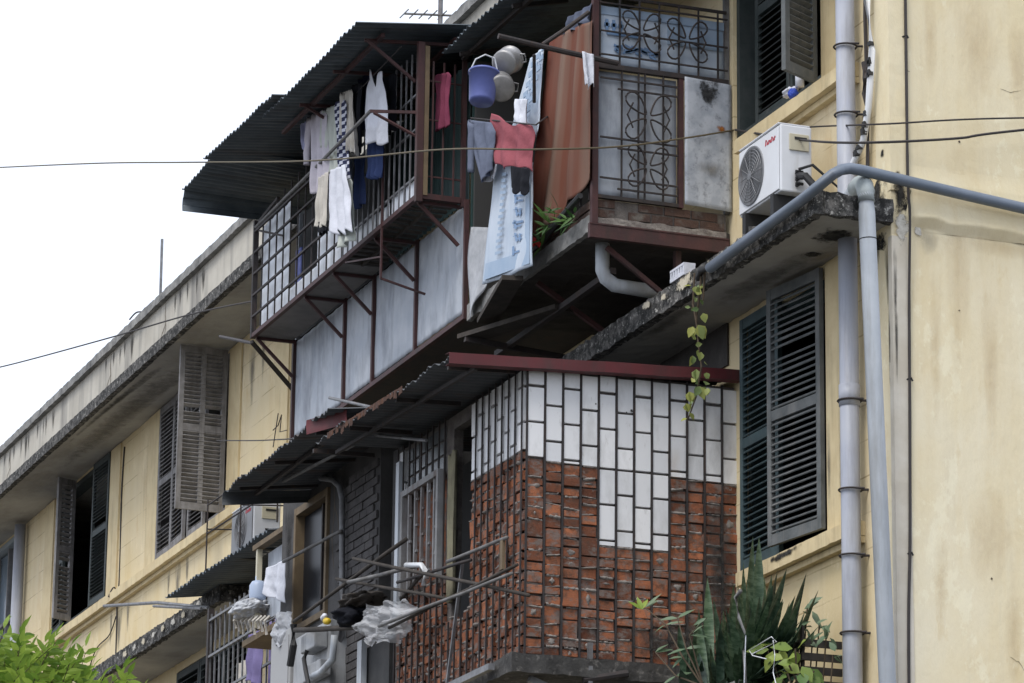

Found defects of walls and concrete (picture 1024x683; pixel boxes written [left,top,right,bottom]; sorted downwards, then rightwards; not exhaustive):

leakage [874,172,911,213]
leakage [806,230,851,257]
leakage [876,233,886,250]